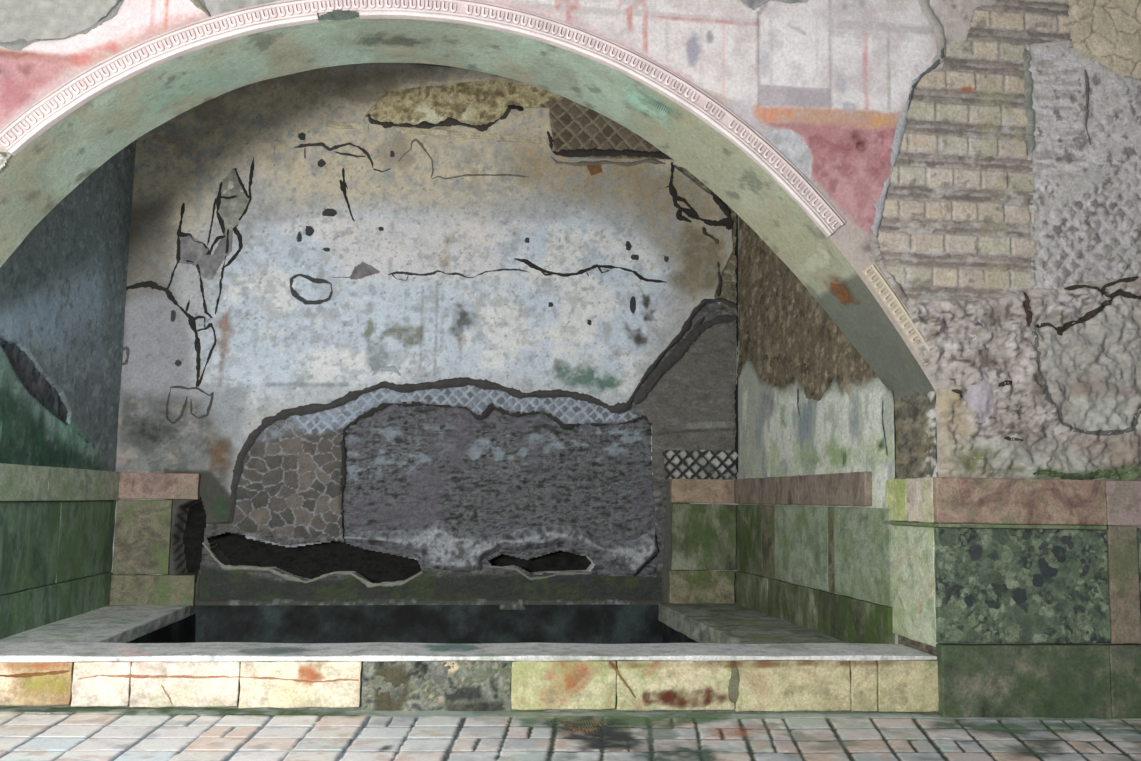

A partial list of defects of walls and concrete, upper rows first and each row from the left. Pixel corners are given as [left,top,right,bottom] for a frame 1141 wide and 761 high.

spalling [0,0,124,51]
spalling [190,0,279,17]
crack [294,138,529,221]
flaking render [871,0,1141,301]
crack [126,158,254,424]
crack [388,258,667,283]
spalling [183,80,878,600]
crack [666,162,739,472]
crack [1023,276,1141,436]
crack [1033,469,1138,480]
corrosion [299,668,320,682]
corrosion [643,689,726,707]